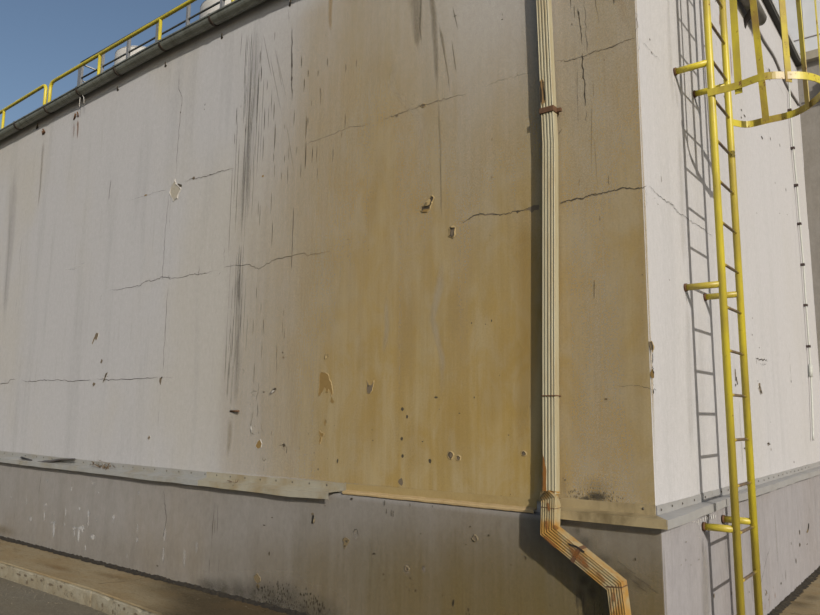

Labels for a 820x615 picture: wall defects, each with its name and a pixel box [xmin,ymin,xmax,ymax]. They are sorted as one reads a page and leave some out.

crack [560,0,657,119]
flaking render [421,195,434,213]
crack [460,205,539,222]
crack [561,187,710,235]
crack [224,210,320,294]
crack [1,190,205,384]
peeling [318,372,334,403]
leakage [163,581,330,615]
leakage [364,548,610,615]
leakage [615,567,665,615]